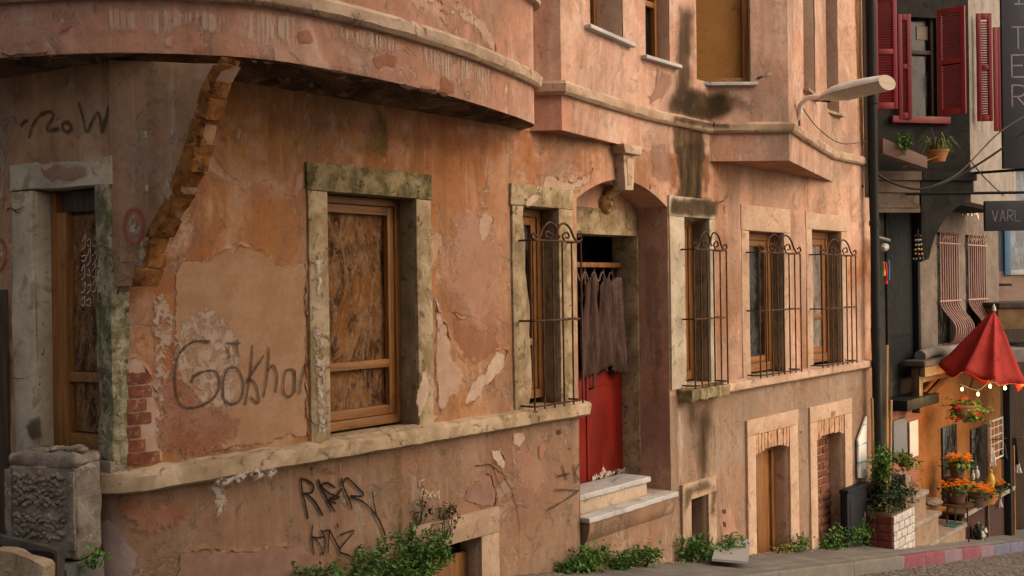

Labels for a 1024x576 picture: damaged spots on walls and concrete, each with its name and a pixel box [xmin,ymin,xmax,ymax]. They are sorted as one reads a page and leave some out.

damp [652,11,738,221]
peeling [126,55,310,467]
peeling [416,297,508,416]